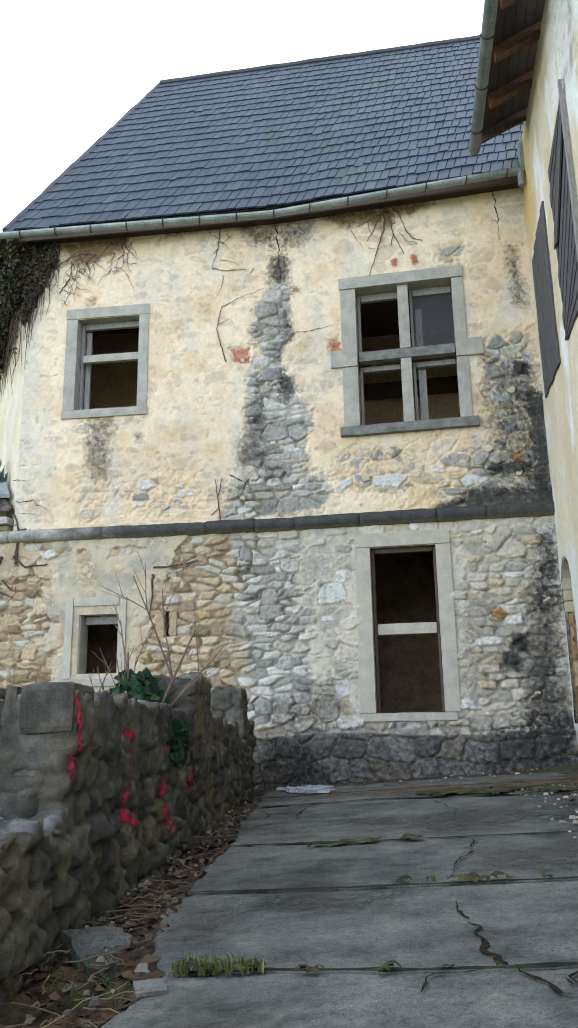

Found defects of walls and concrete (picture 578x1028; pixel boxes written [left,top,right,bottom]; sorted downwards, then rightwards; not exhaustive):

flaking render [222,280,542,520]
water stain [85,419,112,476]
flaking render [216,520,576,747]
crack [431,799,475,874]
crack [421,900,578,994]